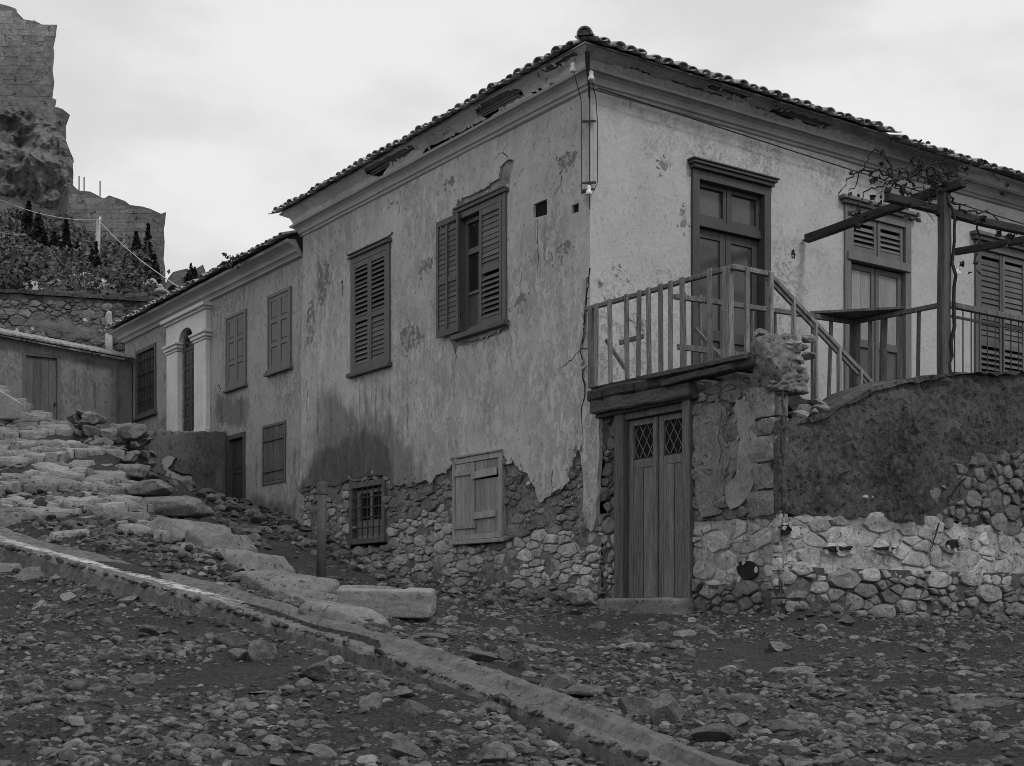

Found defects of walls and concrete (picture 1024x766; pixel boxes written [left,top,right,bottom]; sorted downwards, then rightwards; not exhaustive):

flaking render [424,104,488,153]
peeling [555,150,581,174]
crack [561,268,591,450]
flaking render [298,444,605,604]